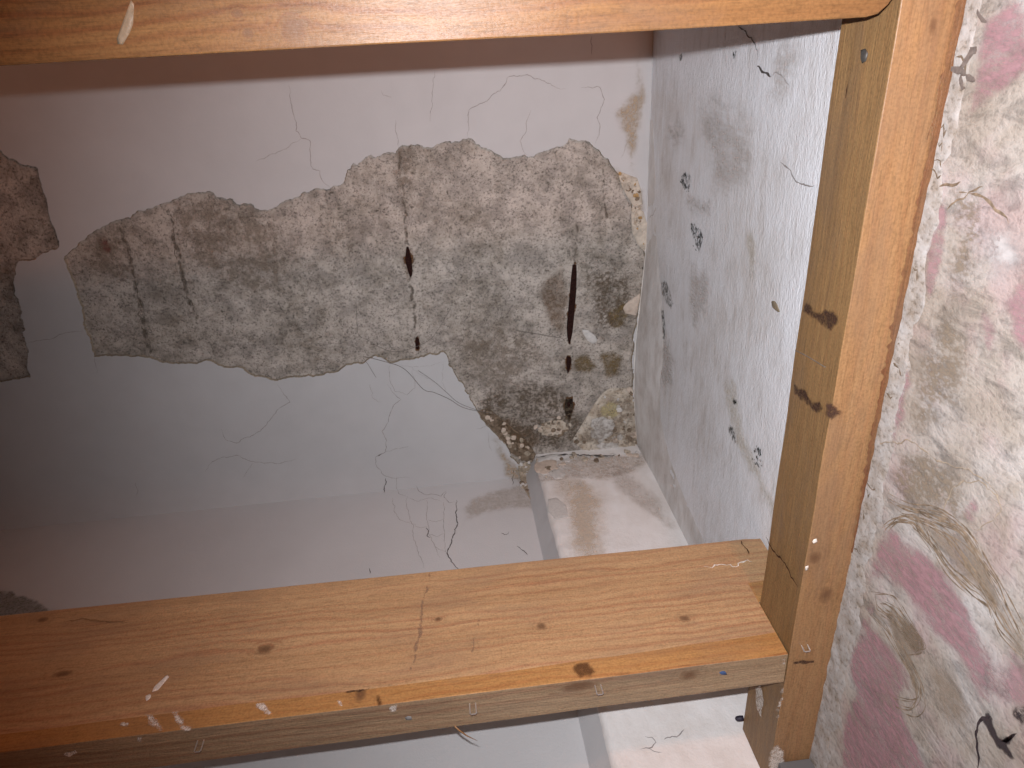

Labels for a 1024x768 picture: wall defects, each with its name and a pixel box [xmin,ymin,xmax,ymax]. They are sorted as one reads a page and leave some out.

crack [467,74,605,143]
corrosion [404,247,414,277]
flaking render [0,138,647,499]
corrosion [544,262,620,376]
damp [593,272,628,325]
corrosion [563,396,575,421]
crack [370,362,458,569]